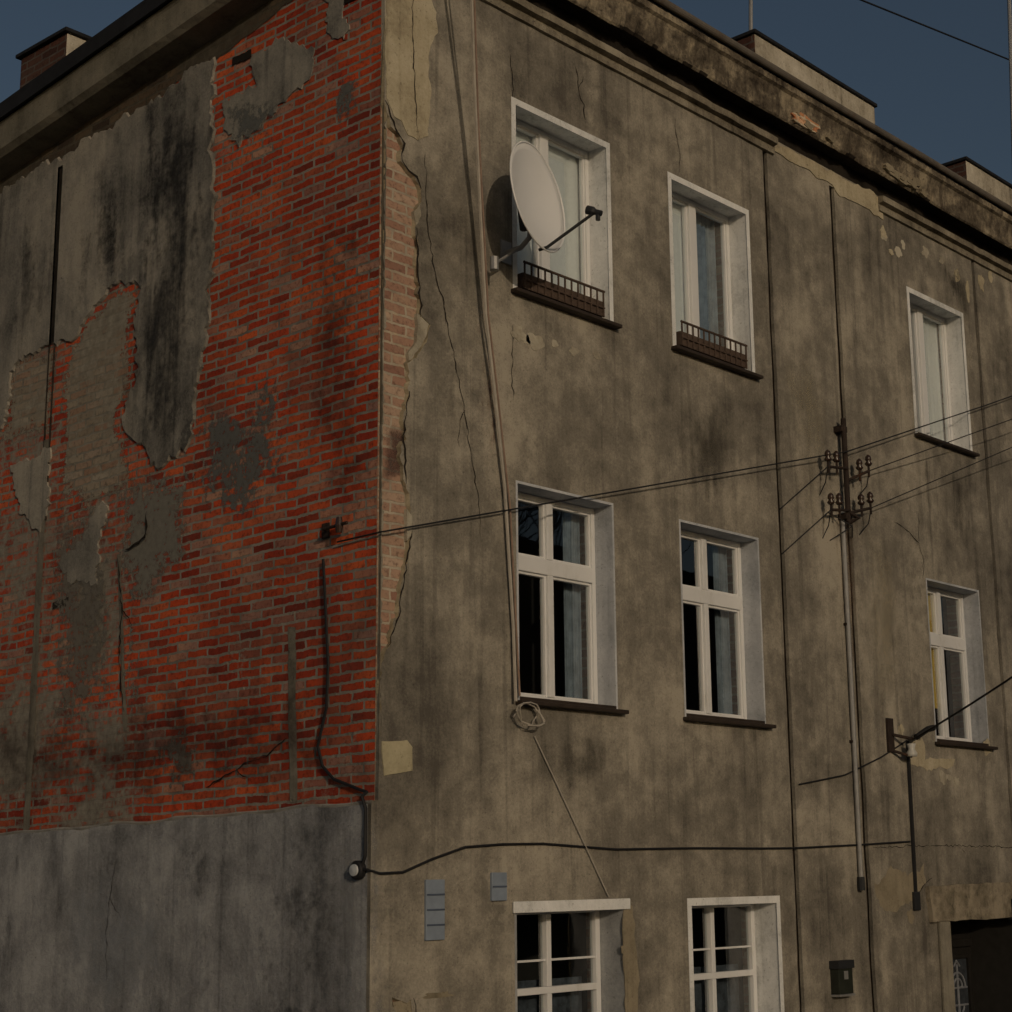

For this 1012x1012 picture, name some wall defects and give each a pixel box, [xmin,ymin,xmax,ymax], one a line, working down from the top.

crack [411,0,419,128]
peeling [773,144,905,258]
crack [424,158,481,537]
peeling [954,269,993,303]
flaking render [0,0,438,832]